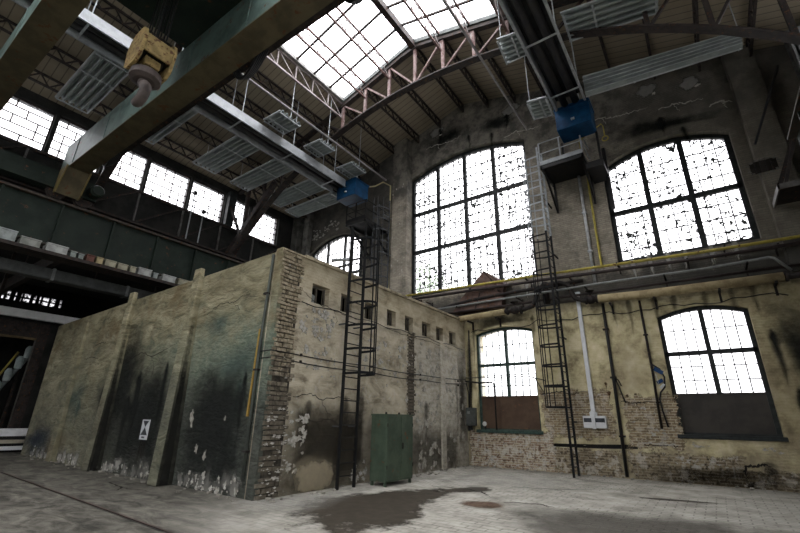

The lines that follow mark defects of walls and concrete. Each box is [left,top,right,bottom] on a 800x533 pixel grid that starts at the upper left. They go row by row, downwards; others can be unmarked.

crack [595,98,733,124]
spalling [254,250,336,500]
damp [769,315,800,377]
damp [87,341,247,486]
crack [293,393,352,428]
spalling [356,331,800,492]
peeling [101,459,149,479]
peeling [177,470,239,497]